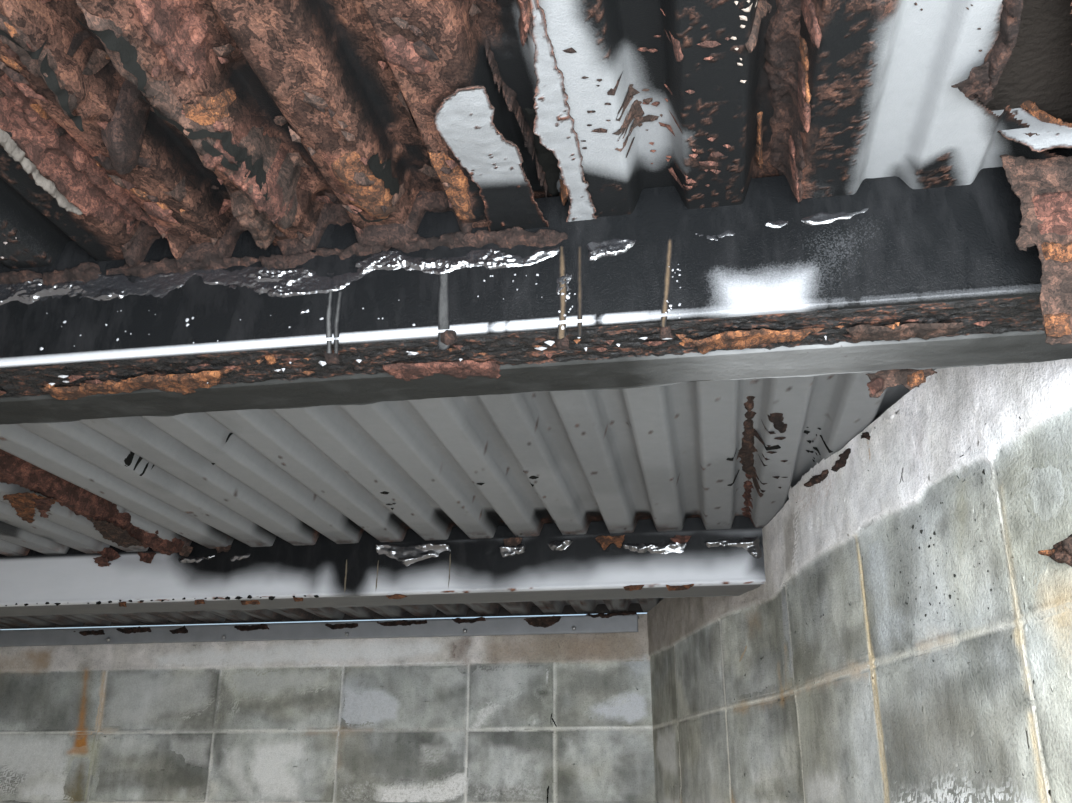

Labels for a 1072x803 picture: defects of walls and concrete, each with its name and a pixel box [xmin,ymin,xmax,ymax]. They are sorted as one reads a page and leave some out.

peeling [798,0,822,133]
peeling [485,39,569,206]
peeling [755,112,763,170]
peeling [1020,100,1072,137]
corrosion [40,368,232,400]
leakage [326,291,342,354]
leakage [438,272,450,350]
leakage [557,246,583,339]
corrosion [681,328,808,354]
corrosion [1000,154,1072,345]
corrosion [788,448,851,534]
corrosion [997,480,1072,803]